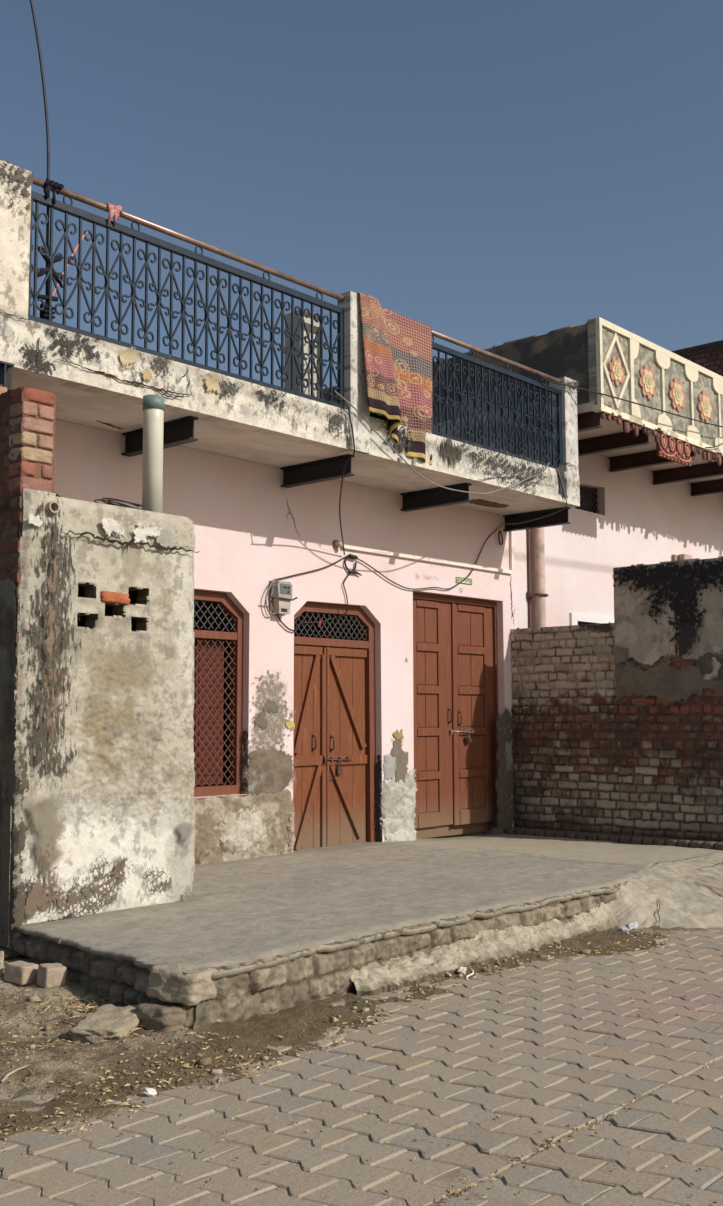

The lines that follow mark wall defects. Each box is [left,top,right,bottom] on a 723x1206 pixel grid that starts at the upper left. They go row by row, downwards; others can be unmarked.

damp [20,328,102,376]
damp [147,351,174,377]
damp [218,374,287,410]
damp [328,410,354,448]
crack [63,530,199,553]
damp [612,558,723,658]
flaking render [615,649,723,703]
flaking render [194,669,296,865]
flaking render [380,729,418,842]